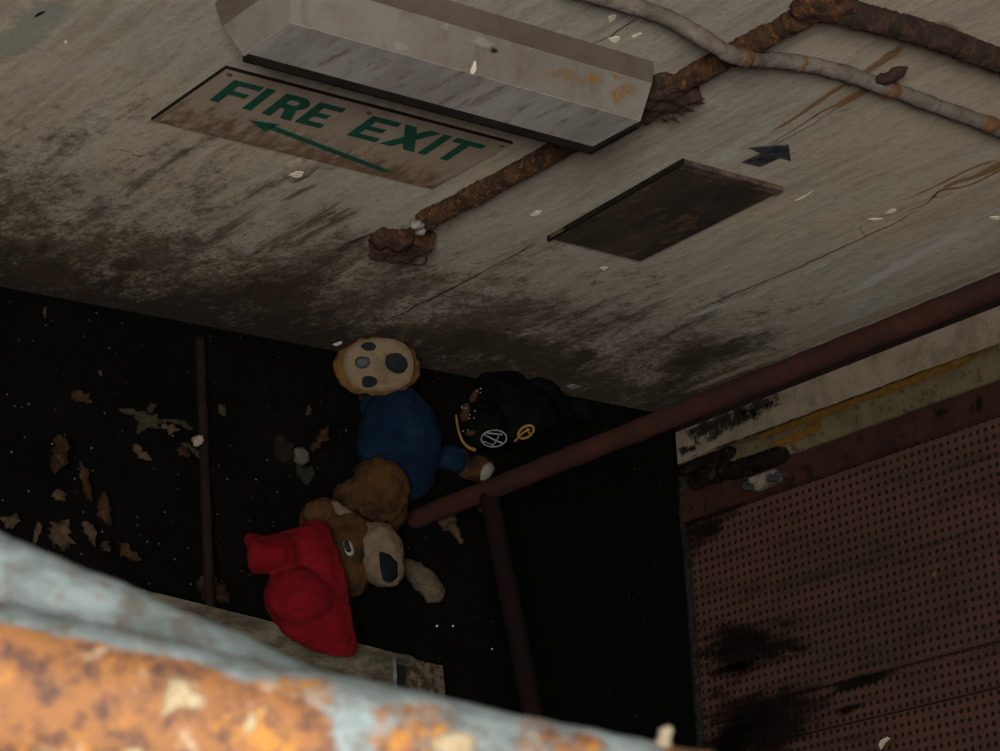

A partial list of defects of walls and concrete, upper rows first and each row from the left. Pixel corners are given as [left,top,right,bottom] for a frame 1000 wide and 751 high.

rust [865,48,900,72]
rust [766,82,902,146]
rust [914,161,1000,209]
crack [687,216,907,314]
water stain [679,394,778,456]
rust [710,349,987,451]
water stain [704,624,806,677]